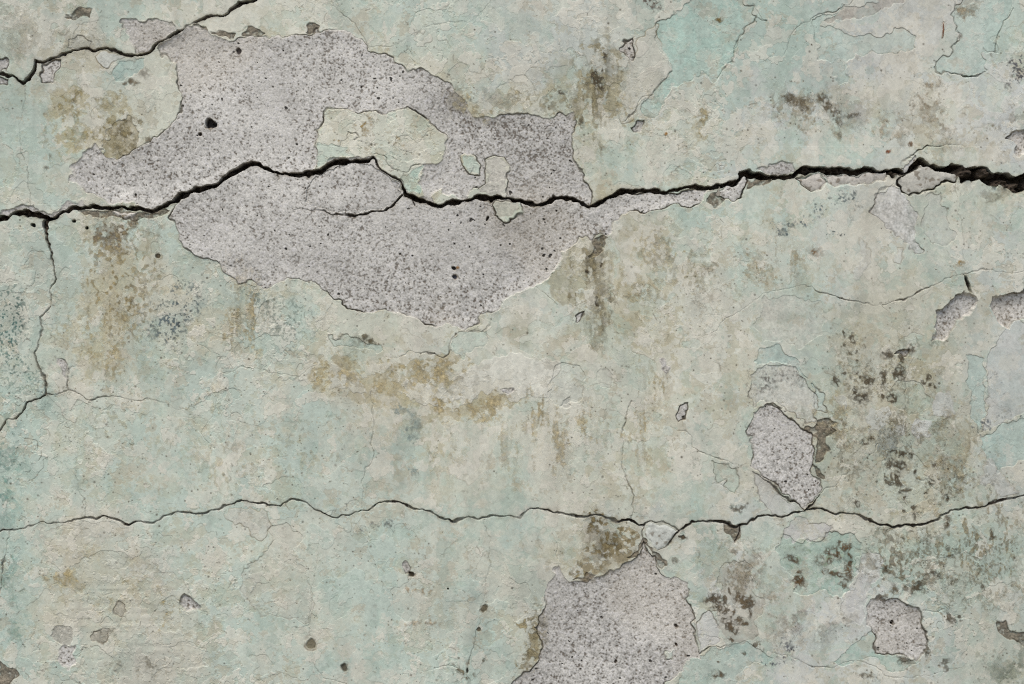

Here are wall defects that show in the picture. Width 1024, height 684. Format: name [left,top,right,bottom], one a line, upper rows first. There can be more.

flaking render [0,0,827,409]
crack [0,0,1024,449]
flaking render [931,289,1024,342]
crack [0,391,1024,593]
flaking render [511,523,774,684]
flaking render [745,344,932,673]